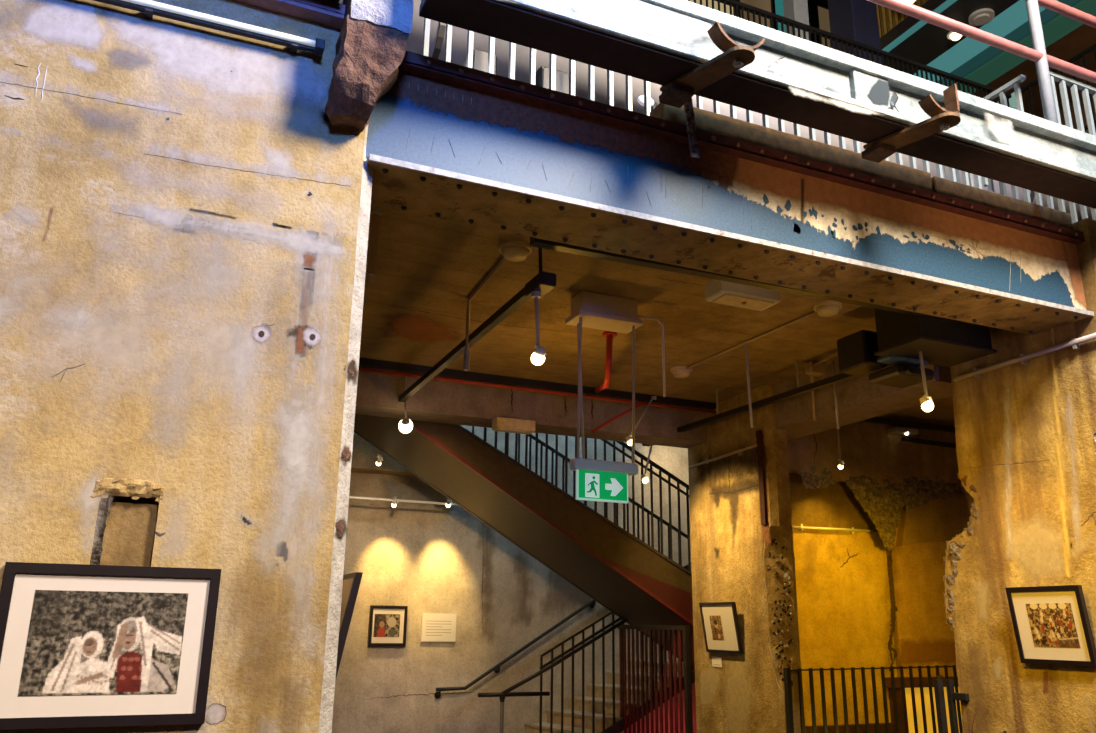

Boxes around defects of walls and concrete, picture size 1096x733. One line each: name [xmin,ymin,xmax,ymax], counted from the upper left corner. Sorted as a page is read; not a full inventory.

peeling [364,94,1076,308]
corrosion [386,70,1087,308]
damp [715,491,738,533]
damp [698,446,764,481]
spalling [762,526,798,696]
spalling [798,466,981,630]
crack [888,549,898,671]